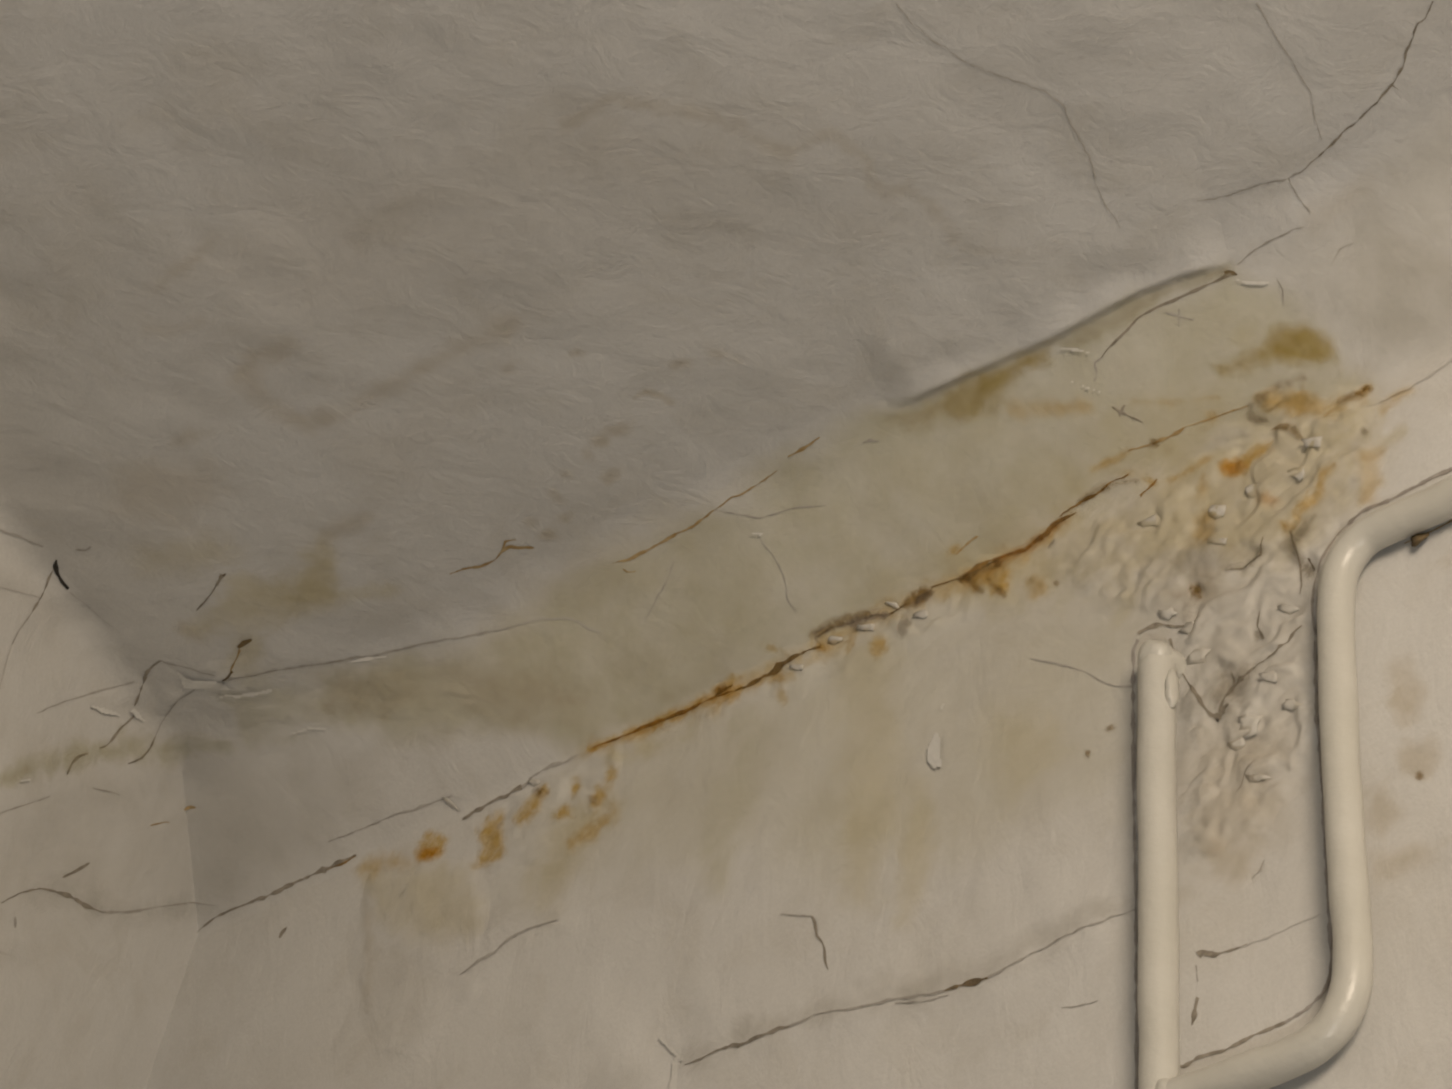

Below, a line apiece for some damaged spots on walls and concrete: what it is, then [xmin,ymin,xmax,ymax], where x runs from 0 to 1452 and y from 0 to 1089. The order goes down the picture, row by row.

crack [896,3,1120,228]
crack [1093,1,1434,382]
crack [1368,360,1452,406]
crack [461,919,557,974]
crack [0,404,1250,931]
crack [684,467,1452,1089]